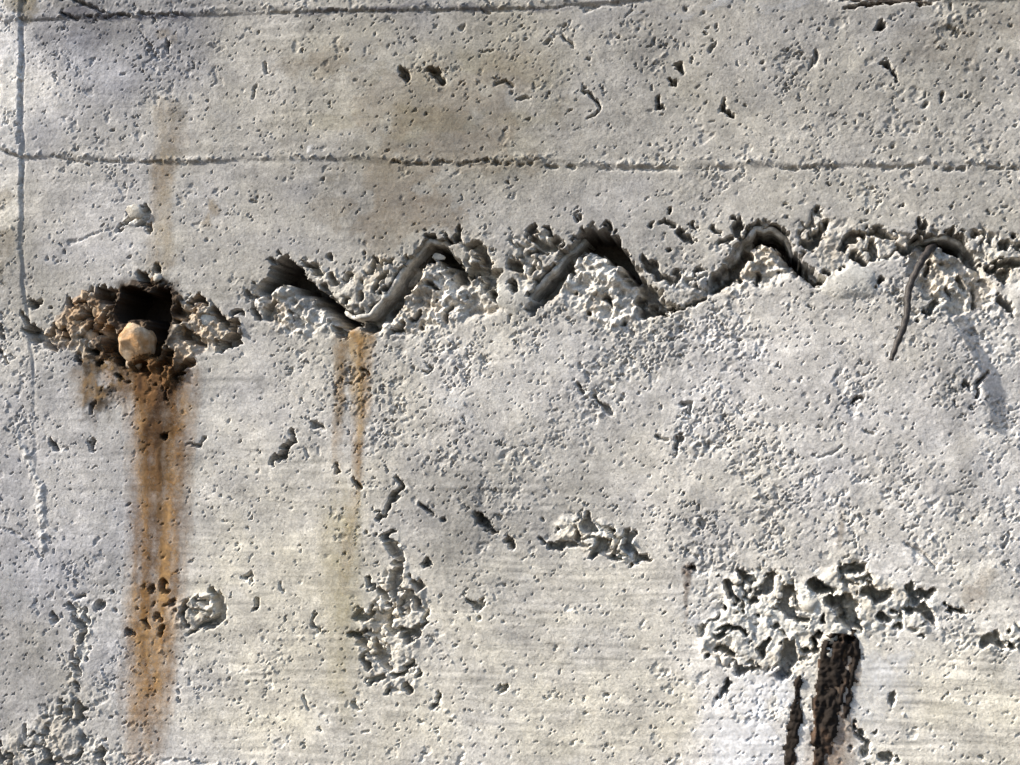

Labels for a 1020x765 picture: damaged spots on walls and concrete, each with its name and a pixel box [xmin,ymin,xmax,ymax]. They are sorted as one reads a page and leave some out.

crack [57,0,185,22]
crack [269,0,644,16]
spalling [20,227,509,391]
spalling [523,217,827,342]
spalling [904,225,999,324]
rust [335,331,373,466]
rust [81,346,188,722]
damp [706,628,907,765]
hole [694,557,968,701]
hole [887,690,897,708]